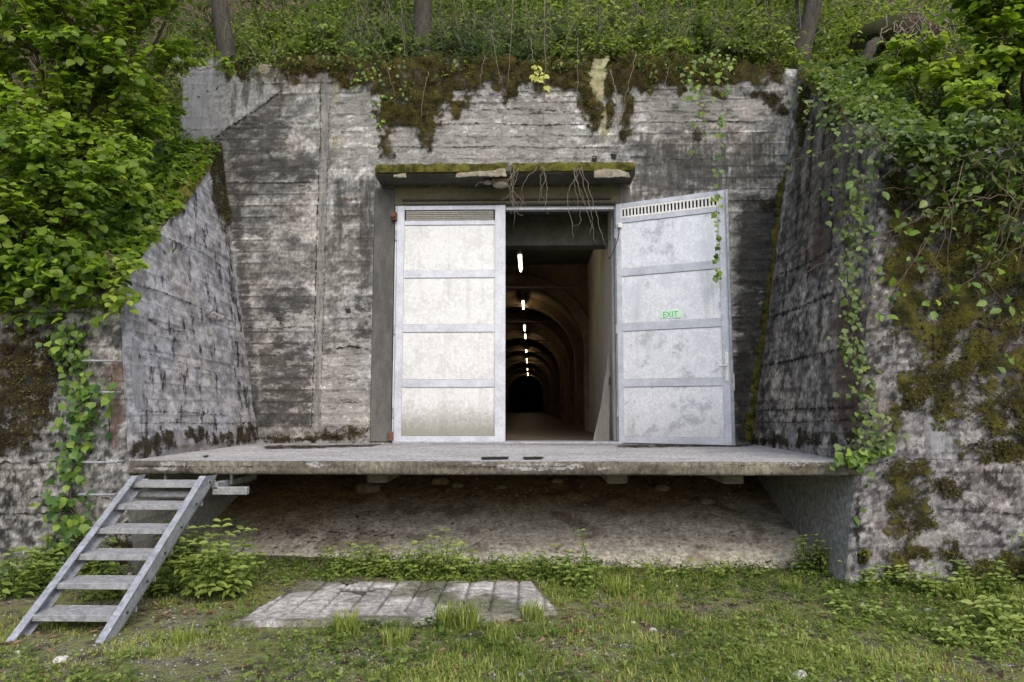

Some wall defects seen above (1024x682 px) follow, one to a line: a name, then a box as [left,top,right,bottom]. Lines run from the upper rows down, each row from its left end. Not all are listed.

water stain [168,73,849,445]
water stain [42,368,81,446]
water stain [139,354,167,449]
water stain [924,393,952,456]
water stain [0,465,60,545]
water stain [984,468,1017,498]